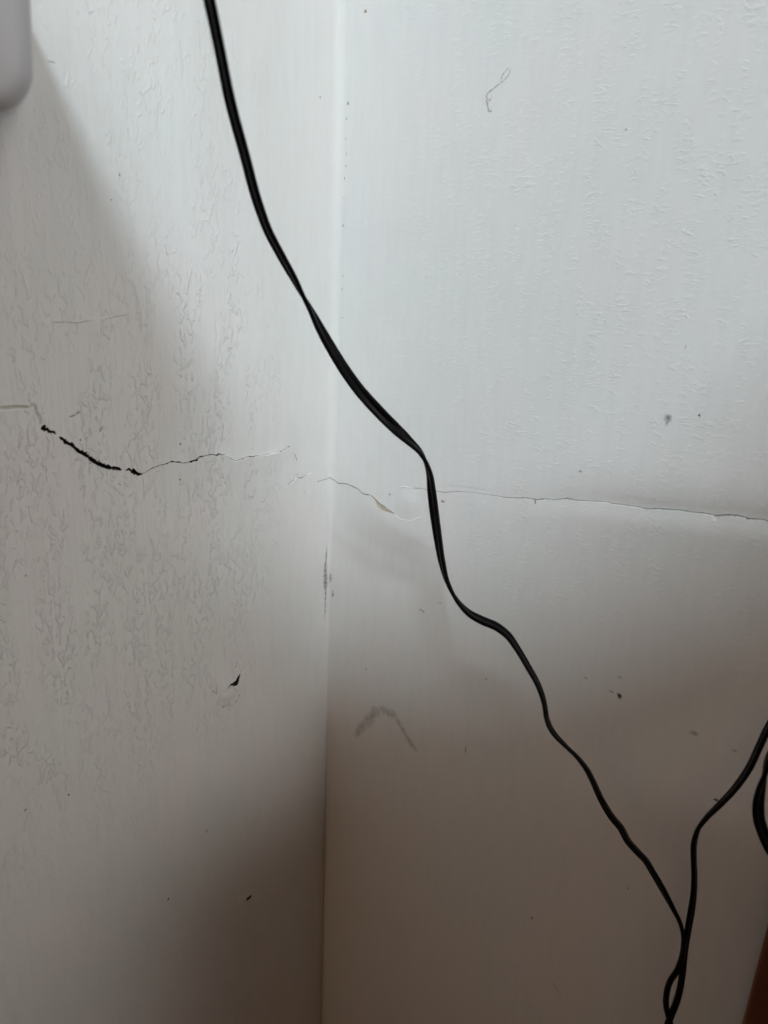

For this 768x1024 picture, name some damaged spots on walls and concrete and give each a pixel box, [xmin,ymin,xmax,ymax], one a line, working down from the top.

crack [41,425,368,495]
crack [417,485,768,523]